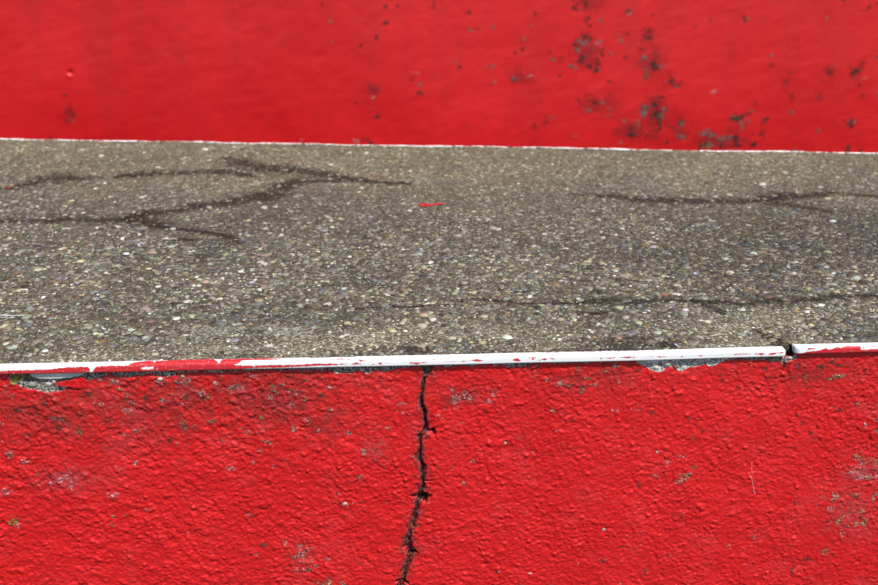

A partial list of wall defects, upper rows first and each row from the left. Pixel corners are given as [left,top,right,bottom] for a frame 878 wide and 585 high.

spalling [433,343,798,386]
spalling [8,365,418,421]
crack [395,353,442,585]